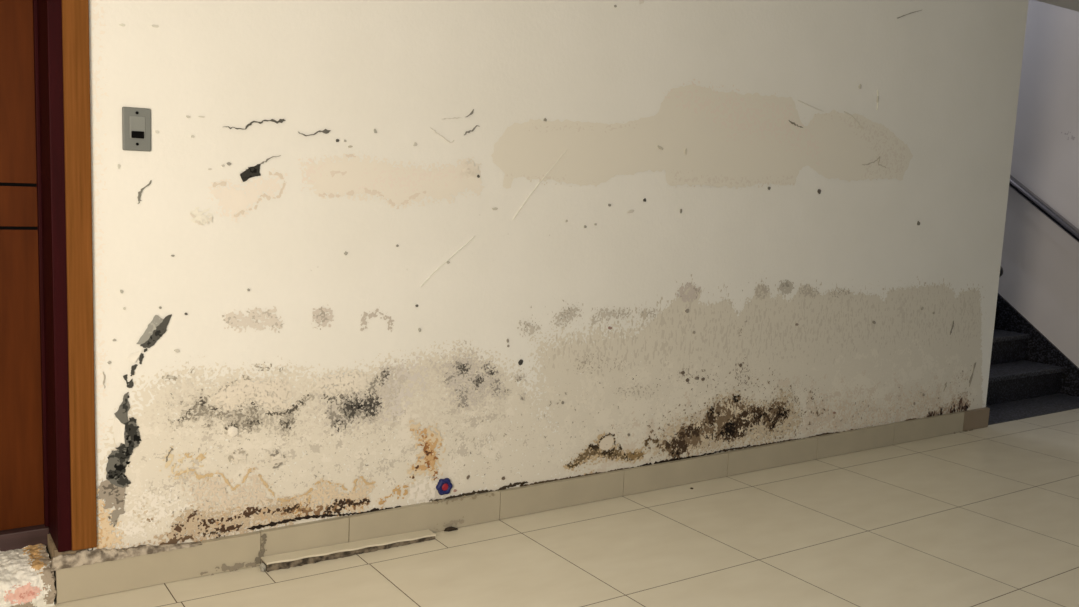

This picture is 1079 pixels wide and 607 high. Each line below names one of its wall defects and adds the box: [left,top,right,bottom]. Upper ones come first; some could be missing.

spalling [240,164,261,182]
crack [224,119,331,136]
peeling [491,79,913,190]
damp [88,0,987,551]
spalling [96,306,188,527]
rust [405,420,446,485]